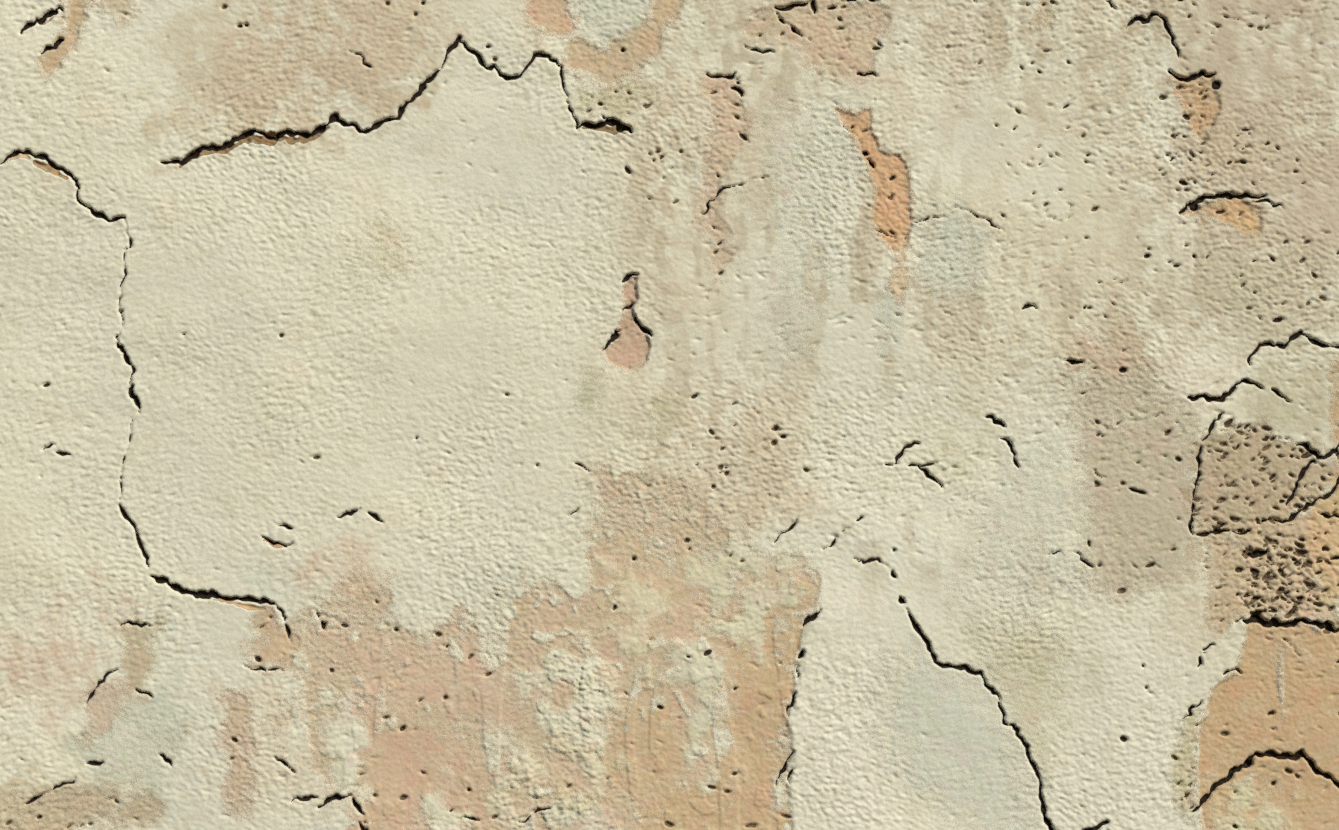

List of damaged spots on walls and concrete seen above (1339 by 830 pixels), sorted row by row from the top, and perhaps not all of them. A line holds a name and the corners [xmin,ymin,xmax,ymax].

flaking render [35,0,96,84]
crack [160,36,632,167]
flaking render [603,276,653,374]
crack [0,150,326,638]
crack [1187,331,1339,558]
flaking render [215,454,825,830]
crack [786,610,820,712]
crack [824,517,1109,830]
flaking render [1175,354,1339,830]
crack [1242,615,1339,663]
crack [776,752,793,785]
crack [1192,750,1339,812]